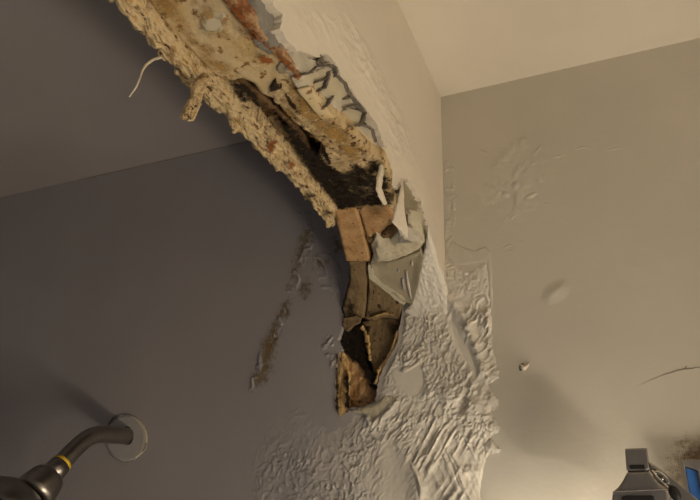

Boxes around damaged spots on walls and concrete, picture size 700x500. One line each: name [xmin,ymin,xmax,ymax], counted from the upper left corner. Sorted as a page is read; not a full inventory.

corrosion [223,2,300,80]
flaking render [109,0,427,305]
leakage [157,0,393,210]
crack [647,366,700,382]